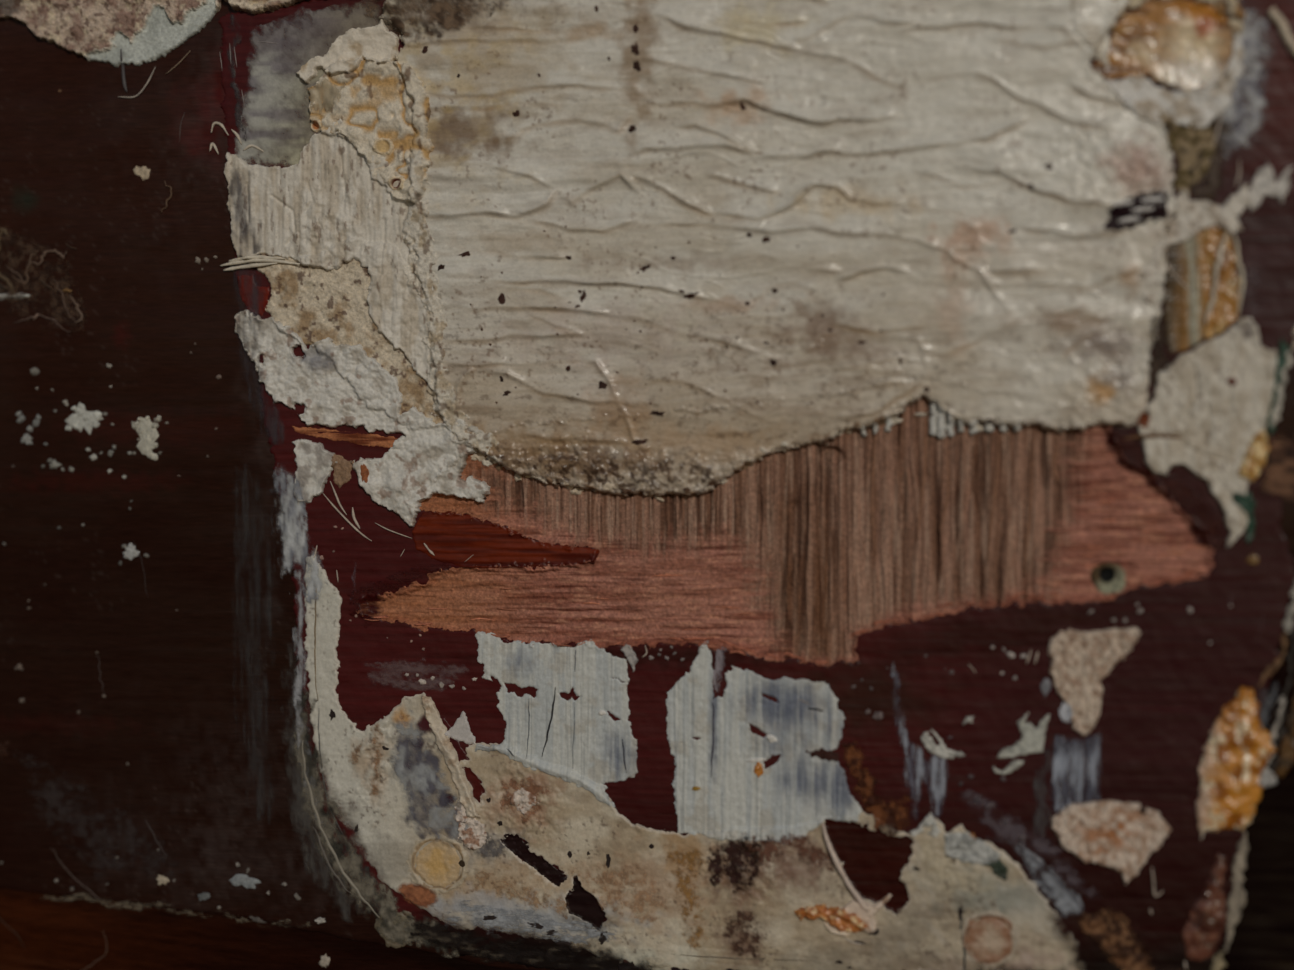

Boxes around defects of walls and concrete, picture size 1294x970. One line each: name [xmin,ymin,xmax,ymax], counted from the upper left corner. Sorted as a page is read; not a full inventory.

peeling [620,644,638,673]
peeling [993,627,1141,775]
peeling [444,711,476,745]
peeling [921,729,966,759]
peeling [746,758,767,777]
peeling [909,812,1008,880]
peeling [794,824,892,937]
peeling [319,954,330,968]